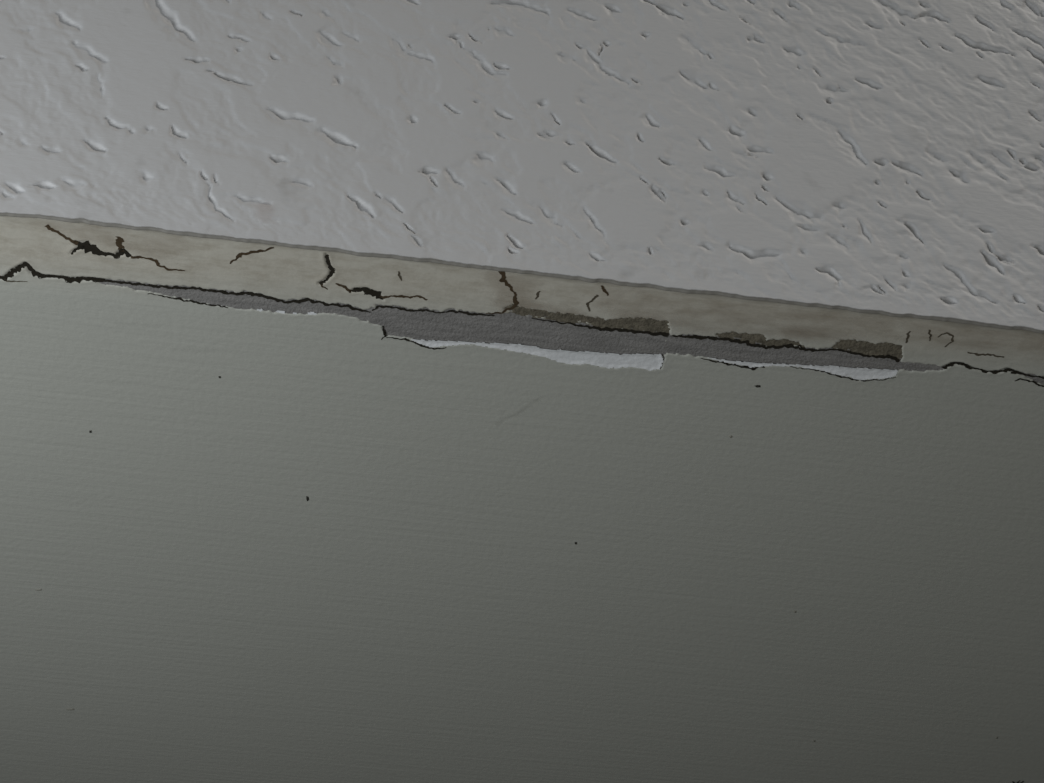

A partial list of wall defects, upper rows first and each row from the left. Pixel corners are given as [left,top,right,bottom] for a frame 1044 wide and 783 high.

crack [0,224,185,283]
crack [230,247,274,264]
crack [319,255,427,301]
crack [486,271,541,314]
crack [586,285,609,311]
peeling [92,279,945,382]
crack [905,330,1021,374]
peeling [1011,371,1044,387]